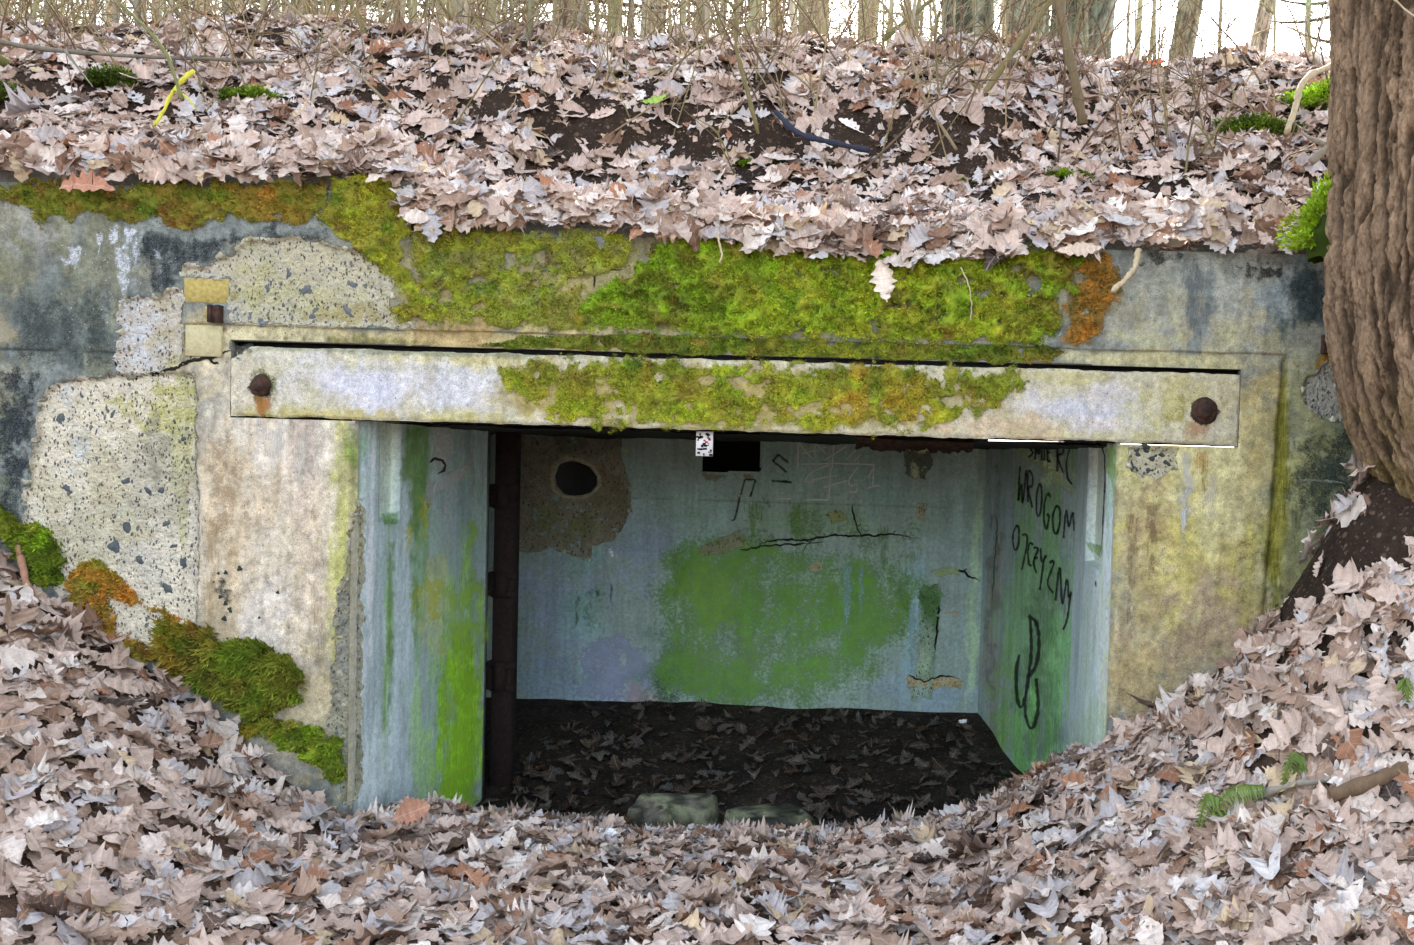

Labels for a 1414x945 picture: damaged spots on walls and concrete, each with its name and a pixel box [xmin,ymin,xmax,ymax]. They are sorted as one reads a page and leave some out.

spalling [20,235,416,655]
corrosion [254,396,271,417]
flaking render [499,425,632,562]
crack [740,504,921,551]